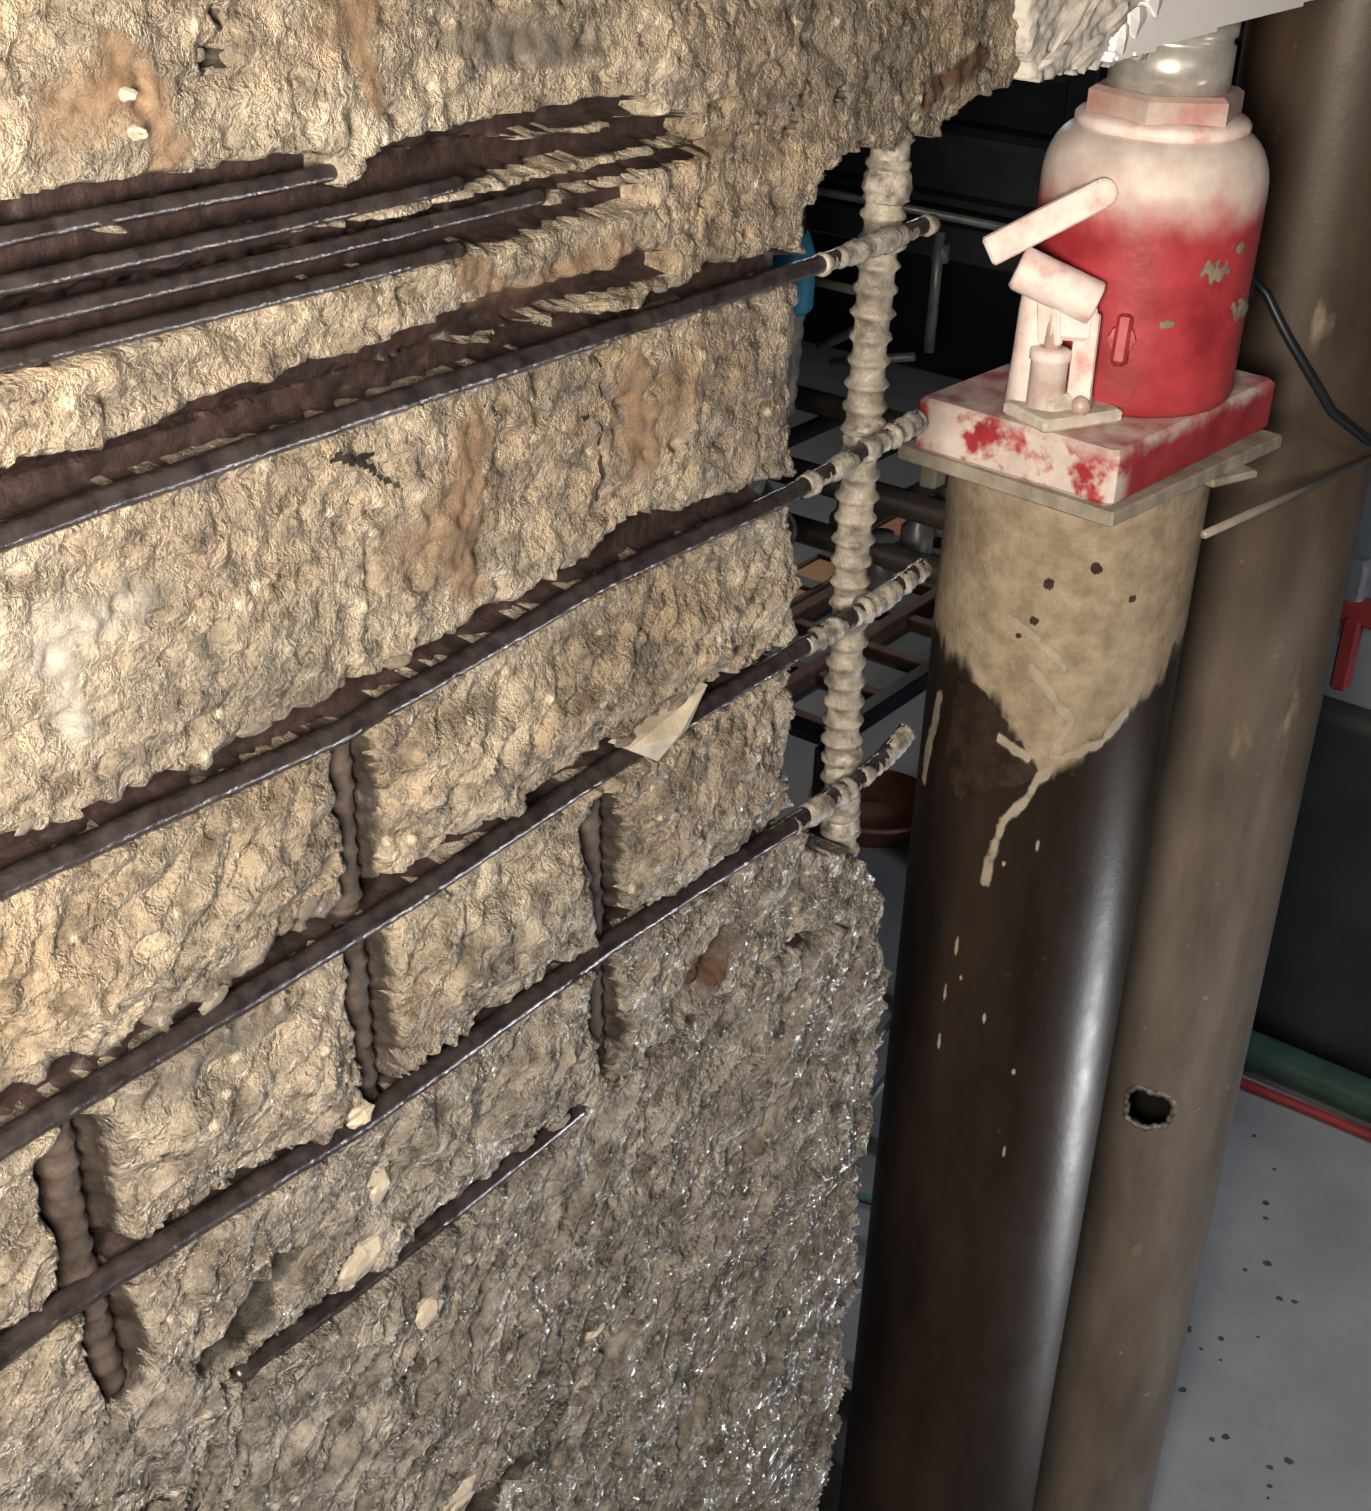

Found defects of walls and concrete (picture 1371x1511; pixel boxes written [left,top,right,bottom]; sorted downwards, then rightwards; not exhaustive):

spalling [830,83,855,112]
spalling [0,136,941,1398]